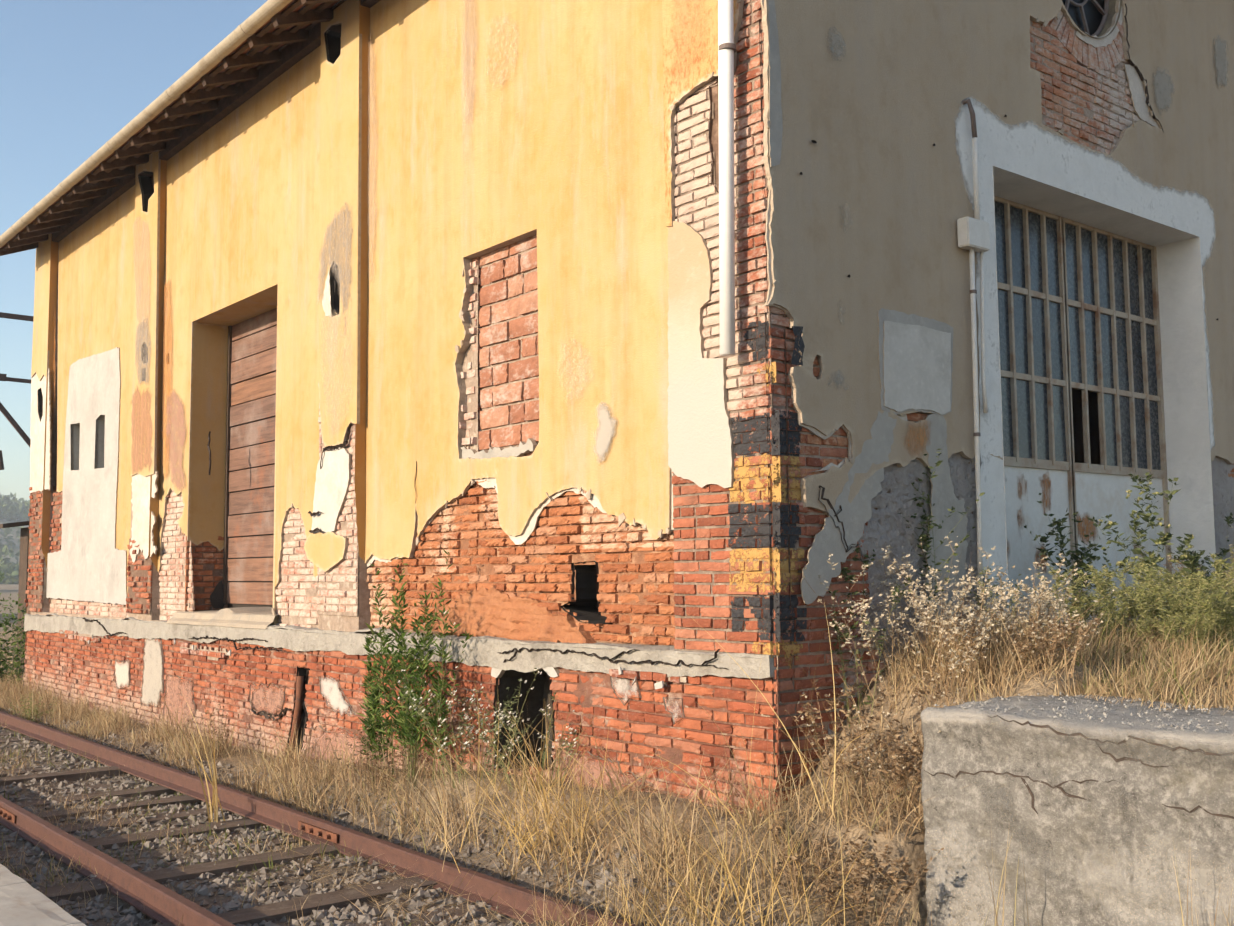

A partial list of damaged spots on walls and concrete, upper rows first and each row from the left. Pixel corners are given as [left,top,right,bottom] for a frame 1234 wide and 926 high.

spalling [1030,10,1159,154]
spalling [272,0,884,808]
spalling [906,412,930,423]
rust [1042,475,1051,513]
spalling [24,486,63,614]
crack [497,647,728,670]
crack [921,715,1234,814]
crack [1162,804,1234,819]